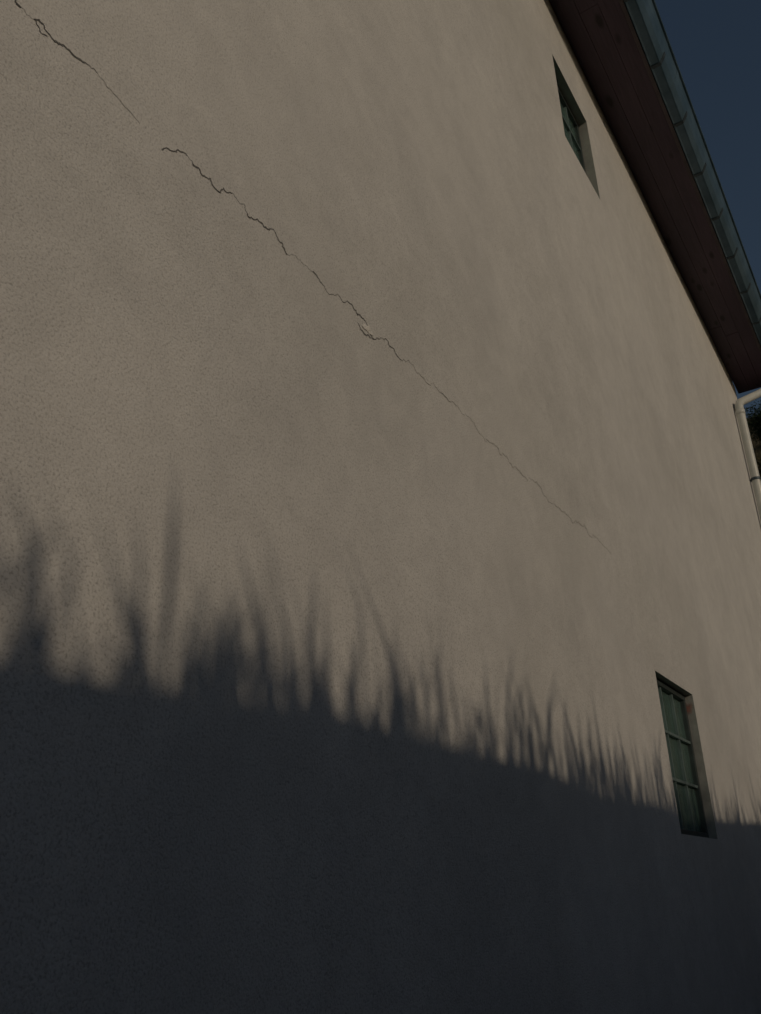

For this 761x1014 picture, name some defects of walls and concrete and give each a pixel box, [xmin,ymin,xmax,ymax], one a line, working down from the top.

crack [15,0,139,122]
crack [162,147,606,548]